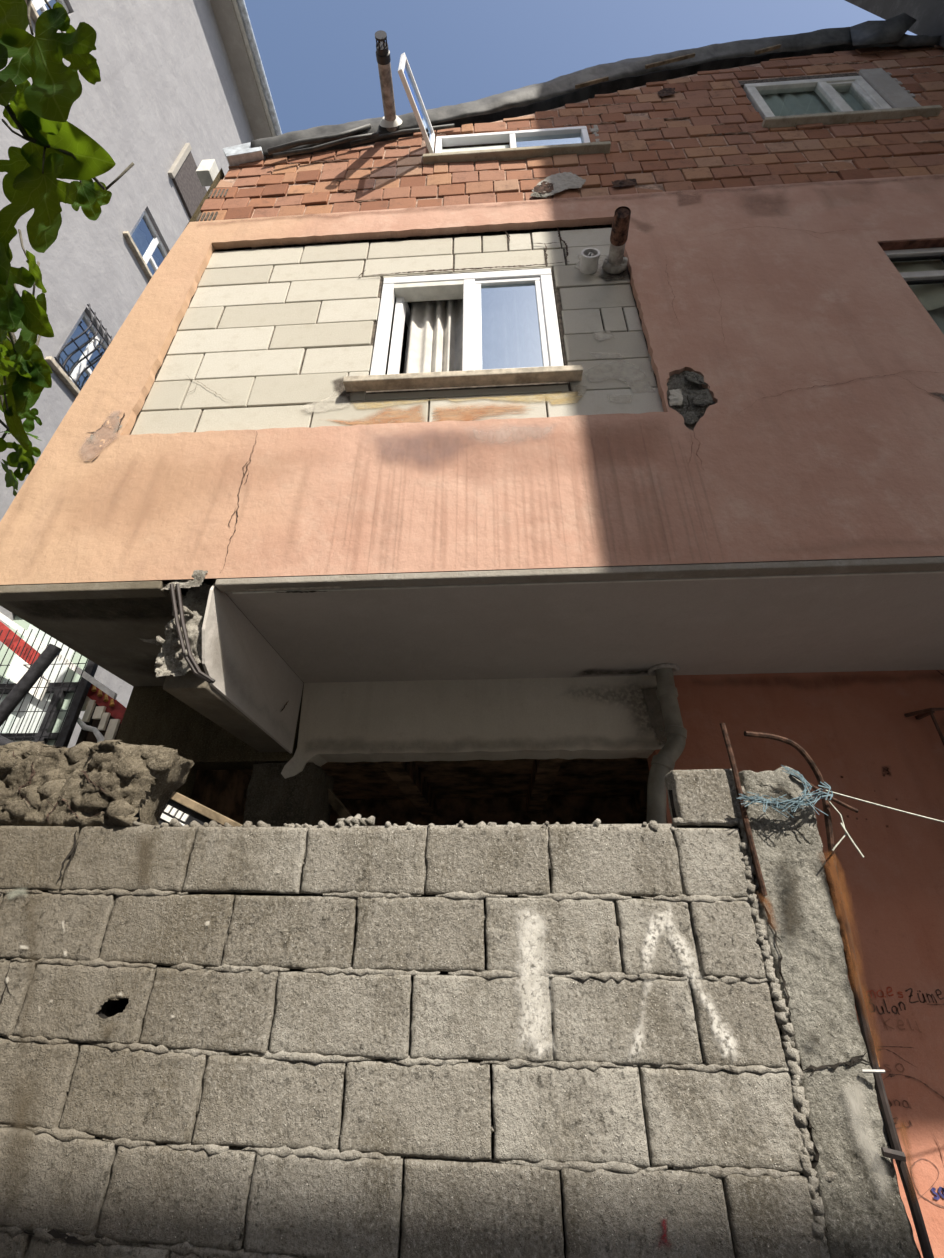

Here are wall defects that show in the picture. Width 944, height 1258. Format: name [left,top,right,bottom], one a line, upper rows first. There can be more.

flaking render [81,411,125,462]
corrosion [333,405,522,425]
spalling [667,371,716,431]
crack [220,431,257,573]
spalling [155,570,215,684]
crack [752,861,871,1075]
crack [807,1120,819,1168]